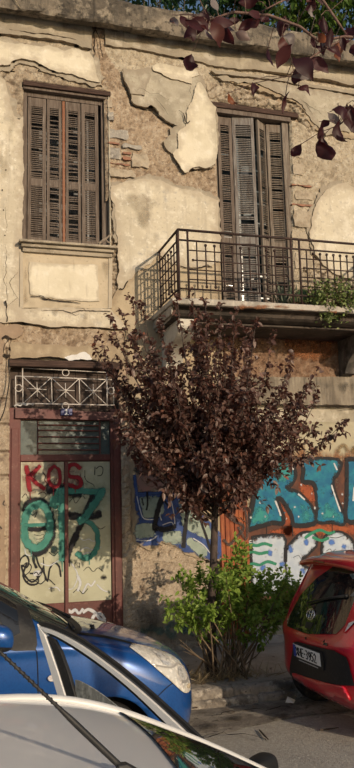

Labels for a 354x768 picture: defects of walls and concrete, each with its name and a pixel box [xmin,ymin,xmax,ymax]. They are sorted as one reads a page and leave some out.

crack [92,27,103,57]
peeling [0,28,354,307]
crack [2,250,111,357]
spalling [10,323,126,348]